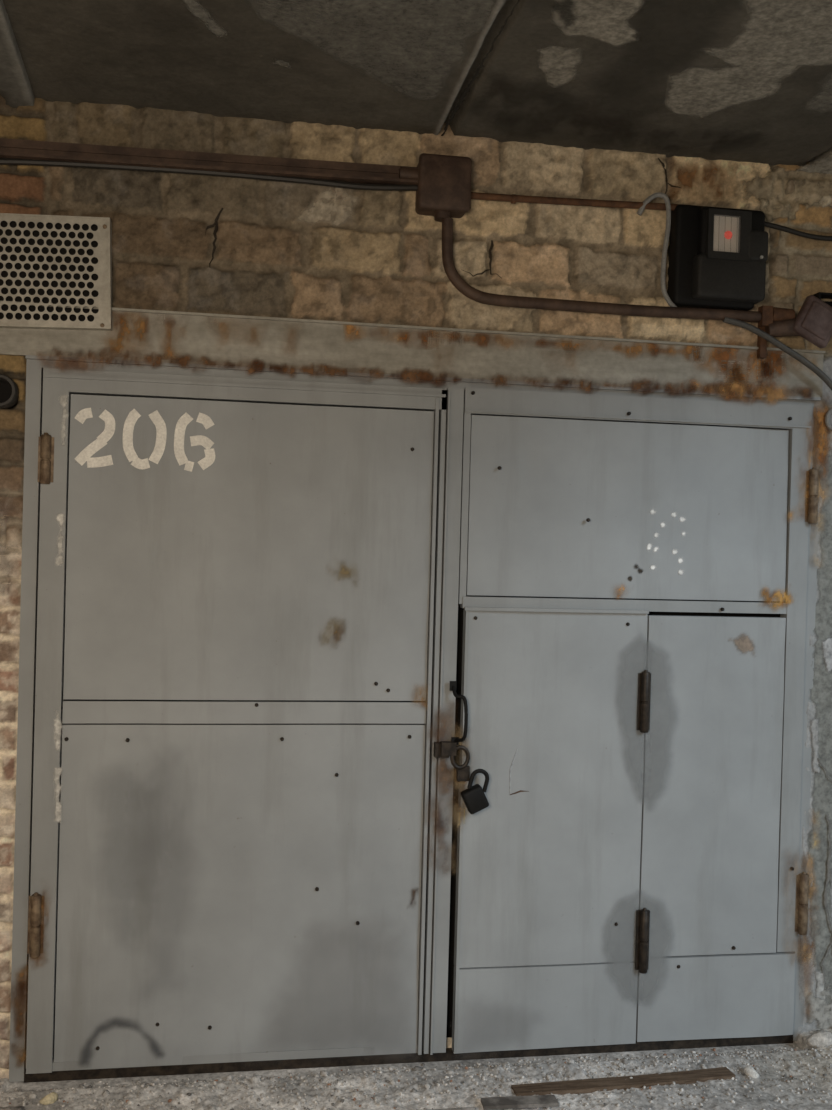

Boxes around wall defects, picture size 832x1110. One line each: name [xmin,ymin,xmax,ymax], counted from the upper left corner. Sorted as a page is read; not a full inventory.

rust [56,315,461,386]
rust [398,331,505,346]
rust [528,379,616,393]
rust [614,342,830,528]
rust [762,589,791,608]
flaking render [806,403,832,1032]
rust [433,760,467,837]